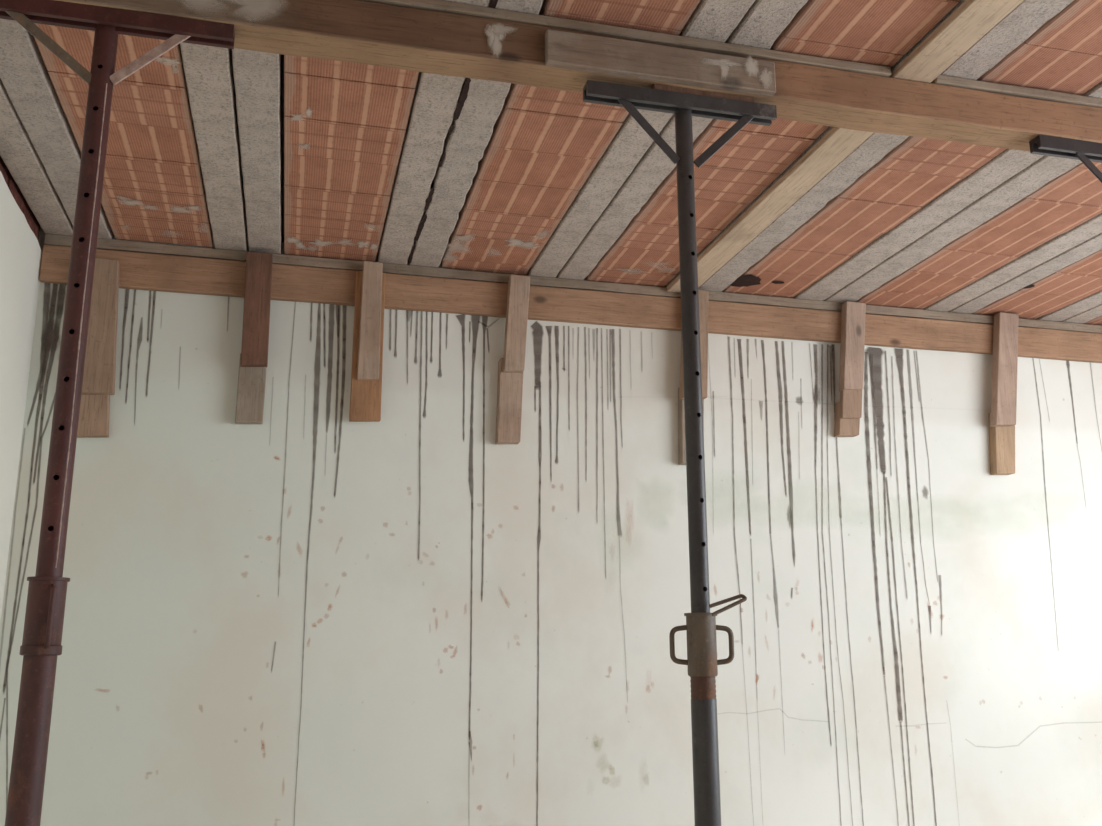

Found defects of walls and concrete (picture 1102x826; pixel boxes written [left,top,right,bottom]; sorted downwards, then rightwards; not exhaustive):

water stain [0,283,66,809]
water stain [119,289,156,423]
water stain [294,303,346,820]
water stain [389,309,489,759]
water stain [531,321,623,826]
water stain [728,337,795,644]
water stain [814,344,864,826]
water stain [864,347,942,826]